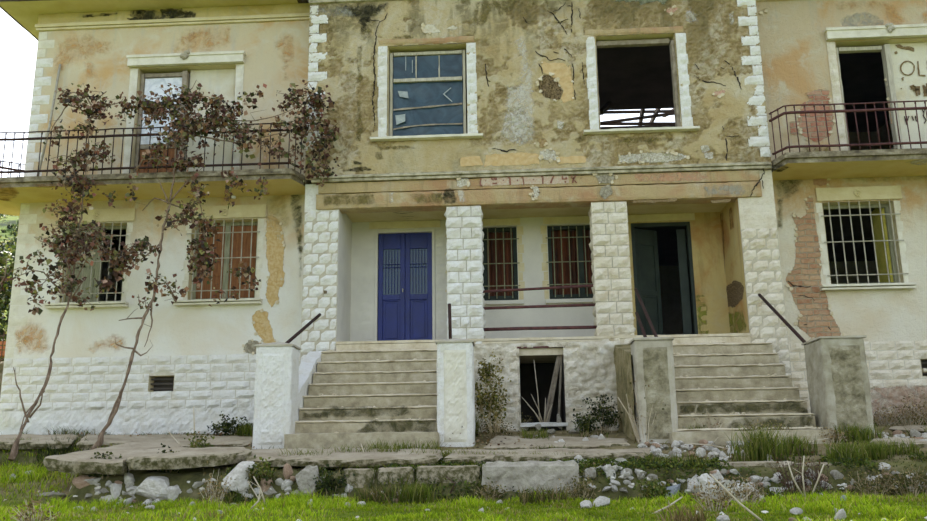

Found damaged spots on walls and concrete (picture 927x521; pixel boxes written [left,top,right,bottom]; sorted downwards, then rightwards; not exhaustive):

peeling [421,23,457,35]
peeling [535,61,574,103]
flaking render [790,89,836,142]
peeling [460,138,586,167]
flaking render [618,150,690,164]
peeling [242,214,286,355]
flaking render [726,281,744,307]
flaking render [785,196,844,339]